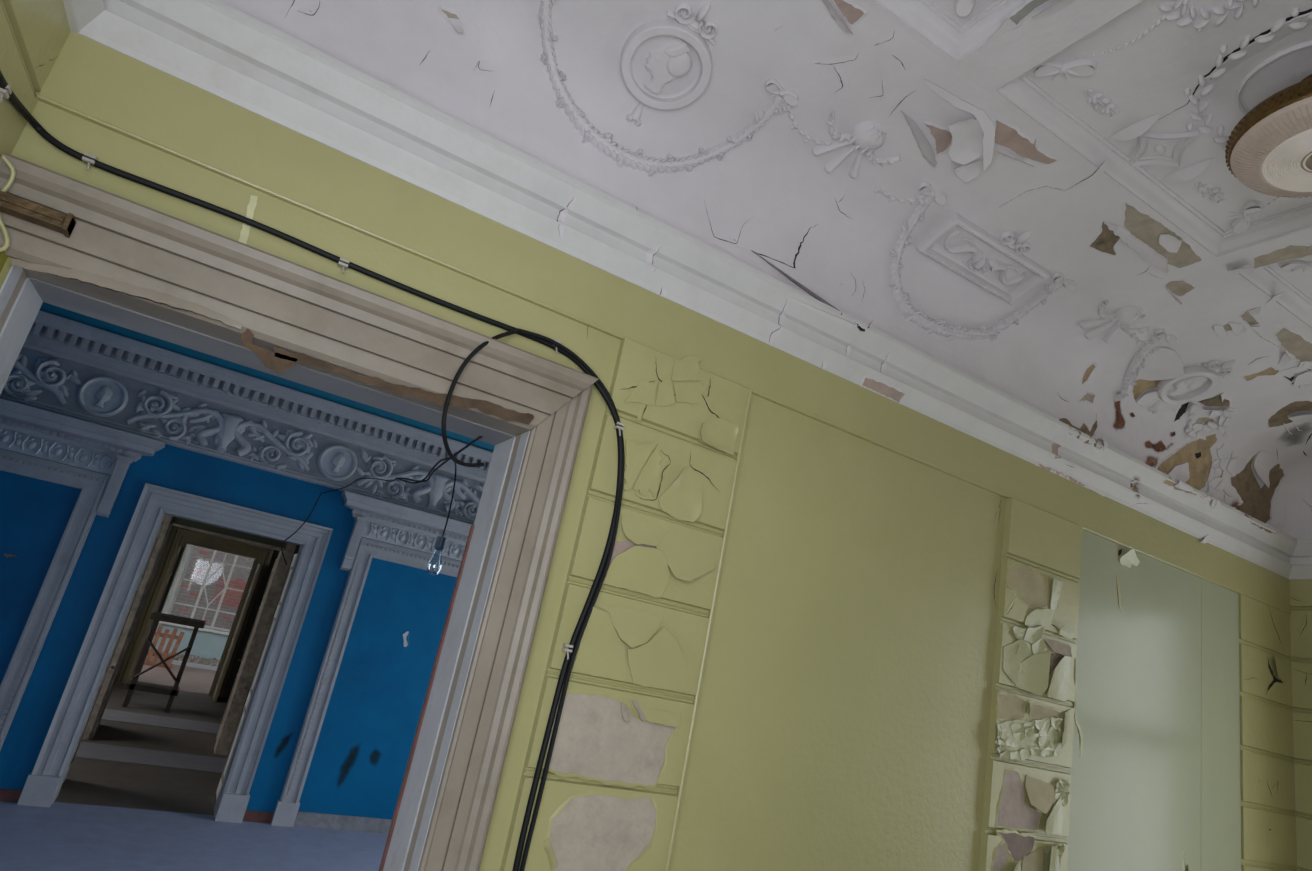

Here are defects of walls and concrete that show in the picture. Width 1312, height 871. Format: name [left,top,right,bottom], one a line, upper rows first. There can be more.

crack [813,30,917,118]
peeling [900,79,1060,182]
crack [1159,8,1312,121]
peeling [1087,201,1204,305]
crack [620,357,736,424]
peeling [1211,306,1312,428]
peeling [603,440,716,598]
crack [634,450,721,501]
peeling [1155,393,1289,536]
damp [338,747,380,785]
peeling [543,604,687,871]
peeling [991,563,1078,871]